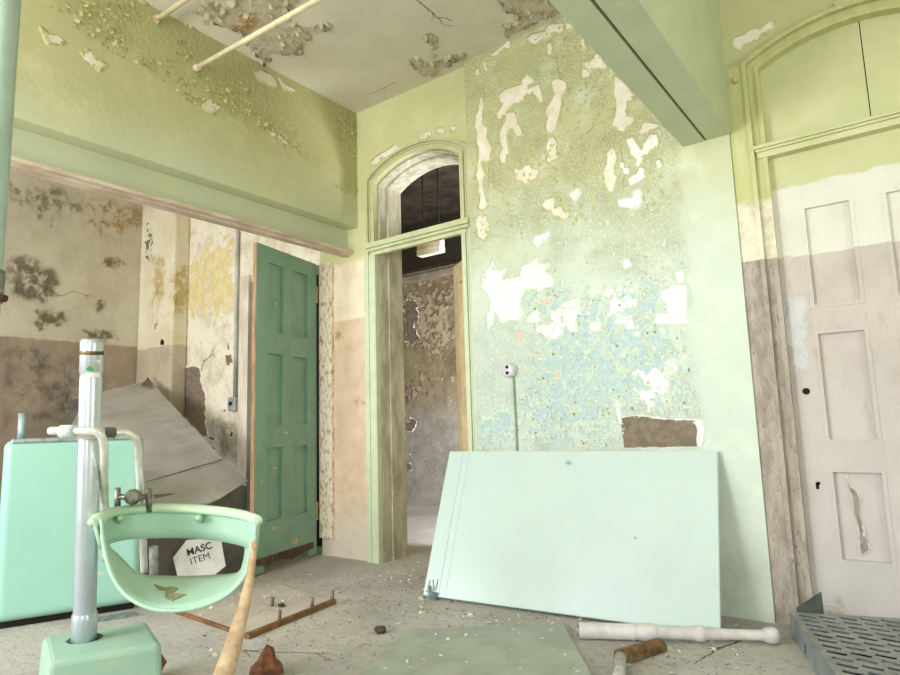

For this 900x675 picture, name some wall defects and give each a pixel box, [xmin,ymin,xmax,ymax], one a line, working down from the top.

peeling [193,0,333,94]
peeling [407,32,467,78]
peeling [732,20,777,53]
peeling [369,144,401,166]
peeling [468,0,707,450]
mould [14,257,58,301]
mould [36,311,64,330]
flaking render [403,287,455,361]
spalling [185,365,215,449]
spalling [405,417,417,432]